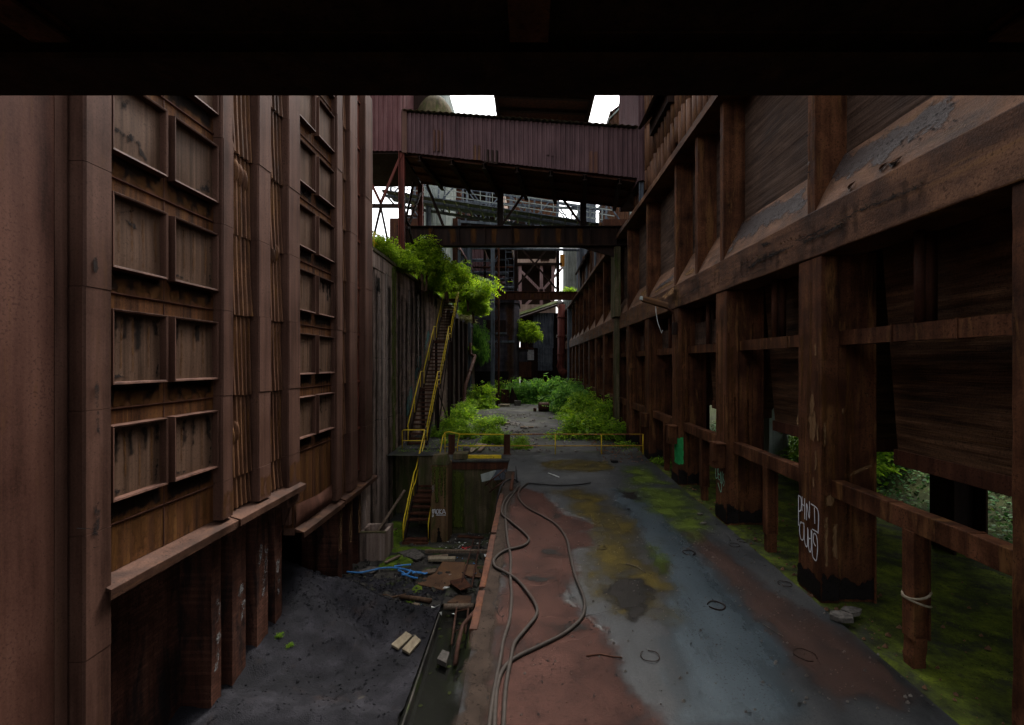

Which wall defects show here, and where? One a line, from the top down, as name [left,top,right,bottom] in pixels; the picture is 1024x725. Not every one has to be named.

peeling [831,96,957,190]
peeling [727,188,807,269]
leakage [615,490,903,725]